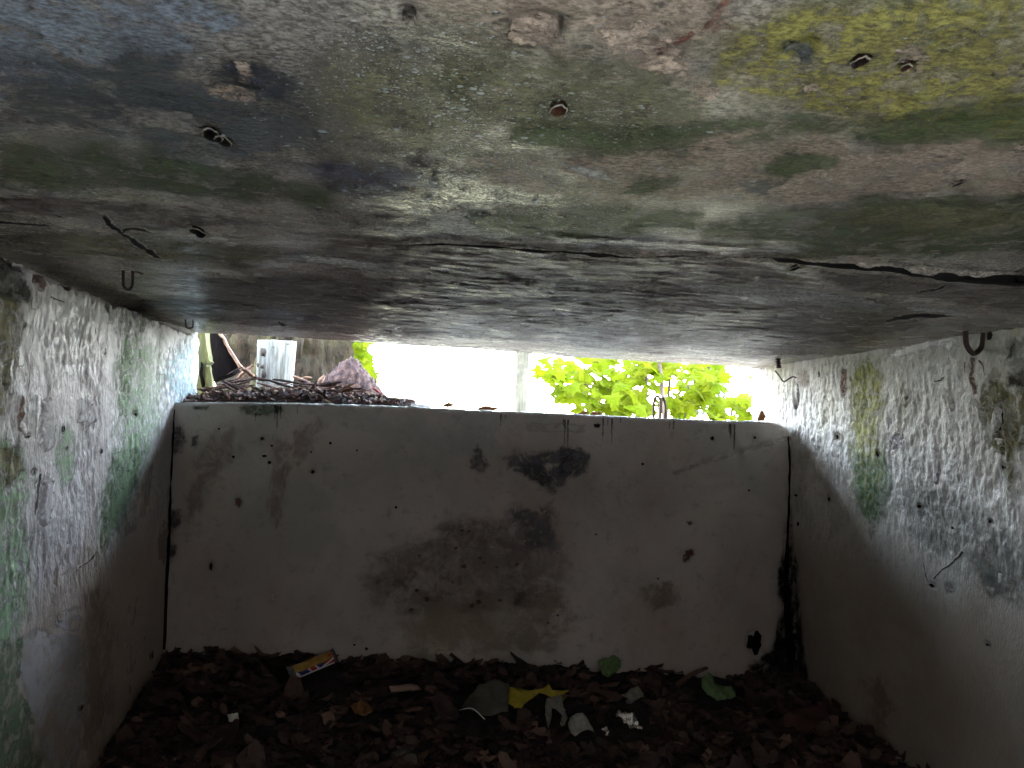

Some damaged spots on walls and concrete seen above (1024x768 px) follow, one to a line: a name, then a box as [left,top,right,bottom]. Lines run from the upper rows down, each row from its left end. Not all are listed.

spalling [208,61,257,104]
peeling [403,0,727,101]
crack [101,215,162,259]
crack [400,242,1024,322]
leakage [255,403,769,493]
leakage [372,507,561,615]
leakage [748,509,807,682]